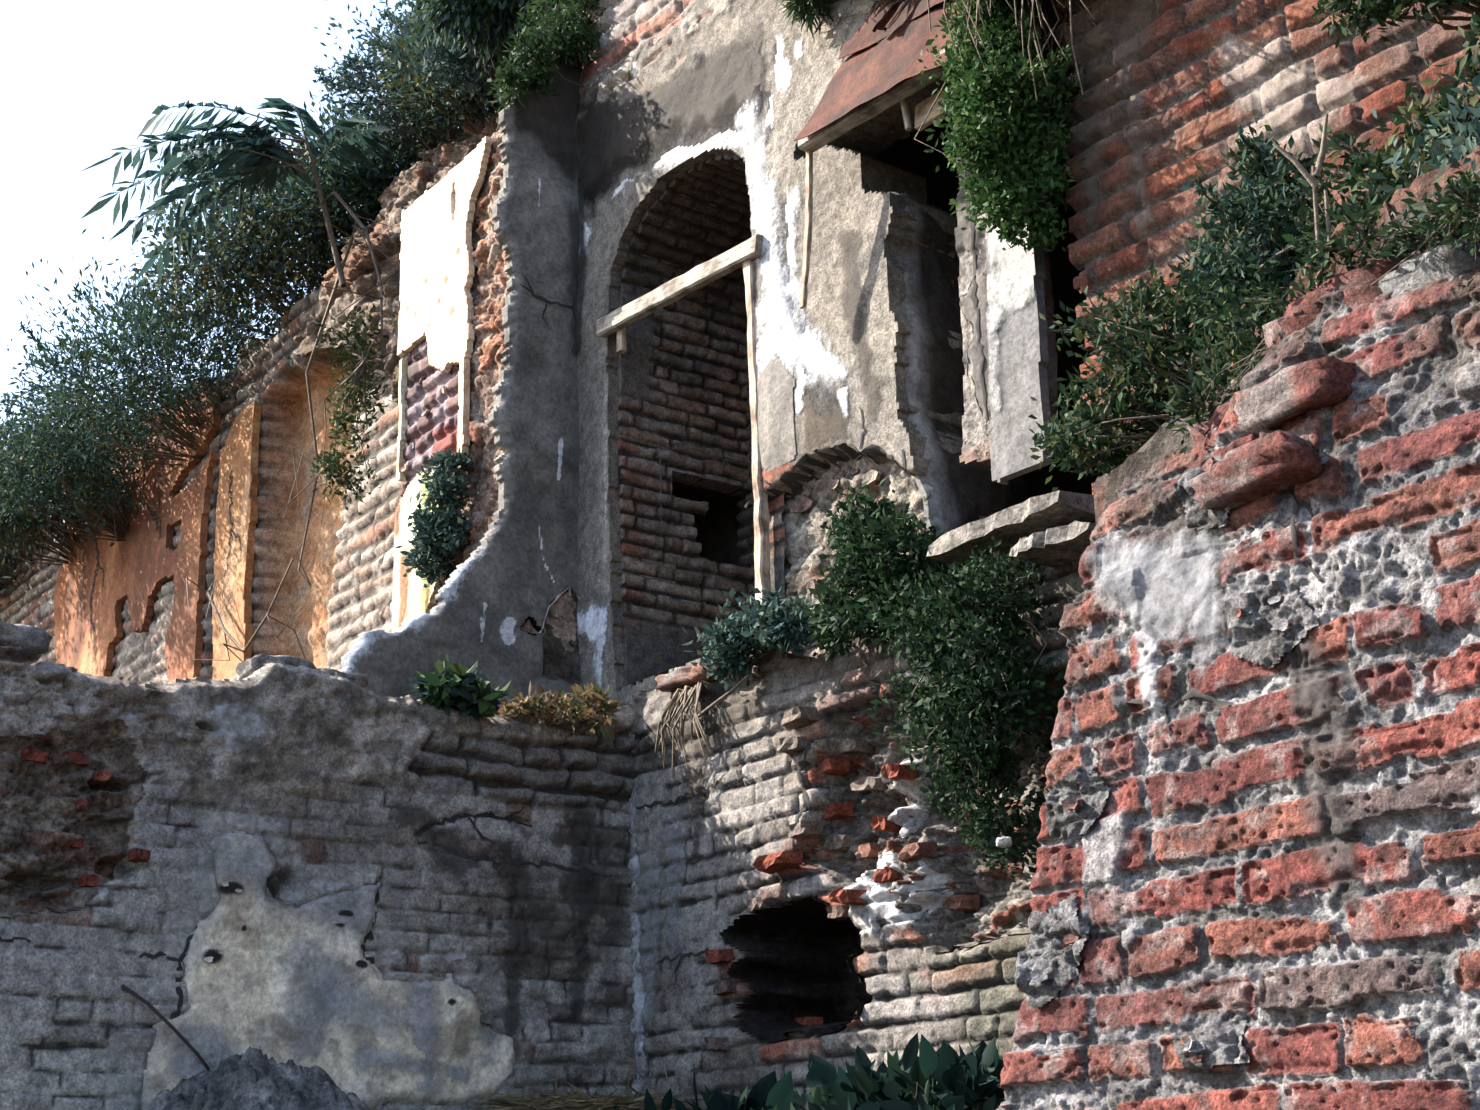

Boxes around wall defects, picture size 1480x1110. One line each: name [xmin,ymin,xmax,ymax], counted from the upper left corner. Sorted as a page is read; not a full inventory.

leakage [592,0,674,50]
leakage [515,21,879,450]
crack [520,273,574,329]
spalling [112,581,174,686]
spalling [0,719,151,918]
crack [418,807,613,877]
spalling [752,692,1111,1008]
crack [0,935,31,943]
flaking render [141,831,516,1110]